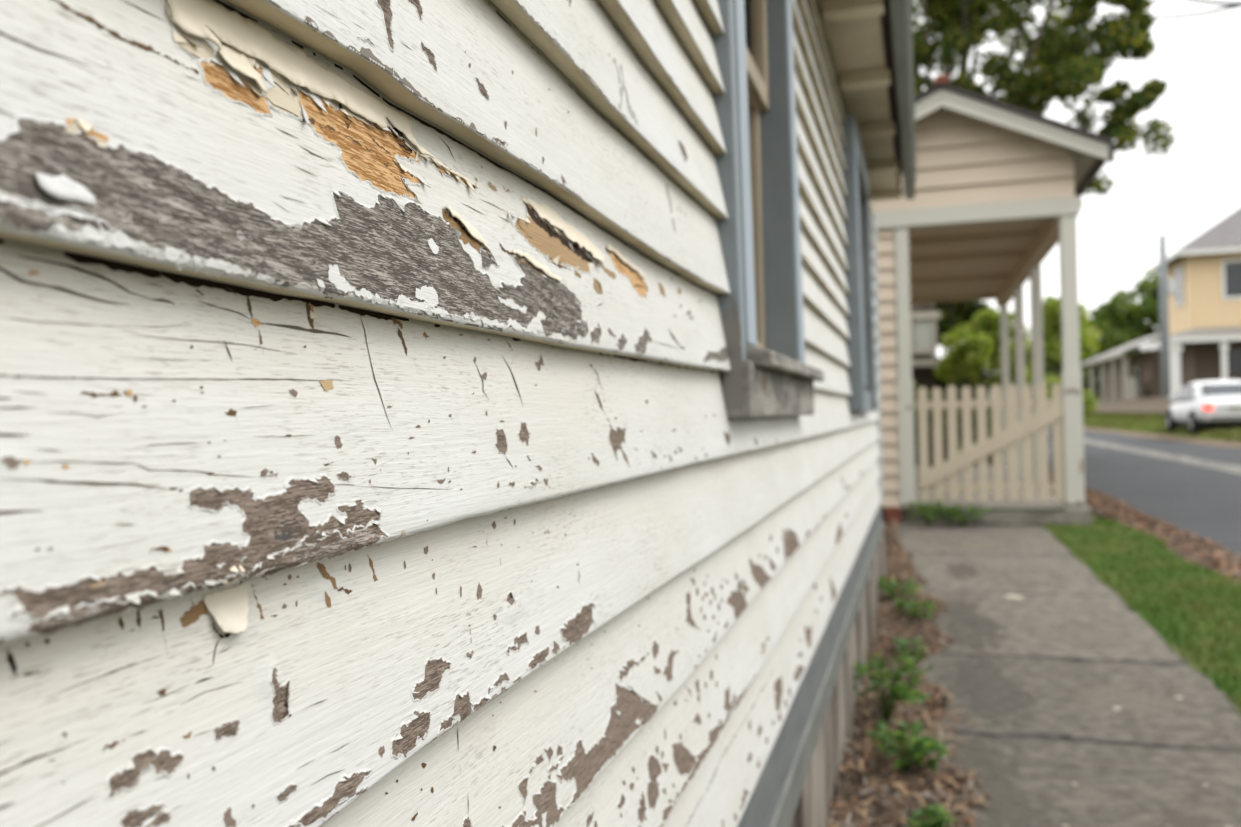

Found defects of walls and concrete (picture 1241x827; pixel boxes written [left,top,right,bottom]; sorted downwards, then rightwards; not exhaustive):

peeling [0,0,652,356]
crack [0,255,392,514]
crack [398,328,416,365]
peeling [0,467,390,637]
peeling [685,512,827,658]
peeling [104,731,192,802]
peeling [224,807,236,827]
peeling [269,665,290,726]
spalling [284,768,373,827]
spalling [379,601,597,760]
peeling [500,635,769,827]
peeling [747,575,837,769]